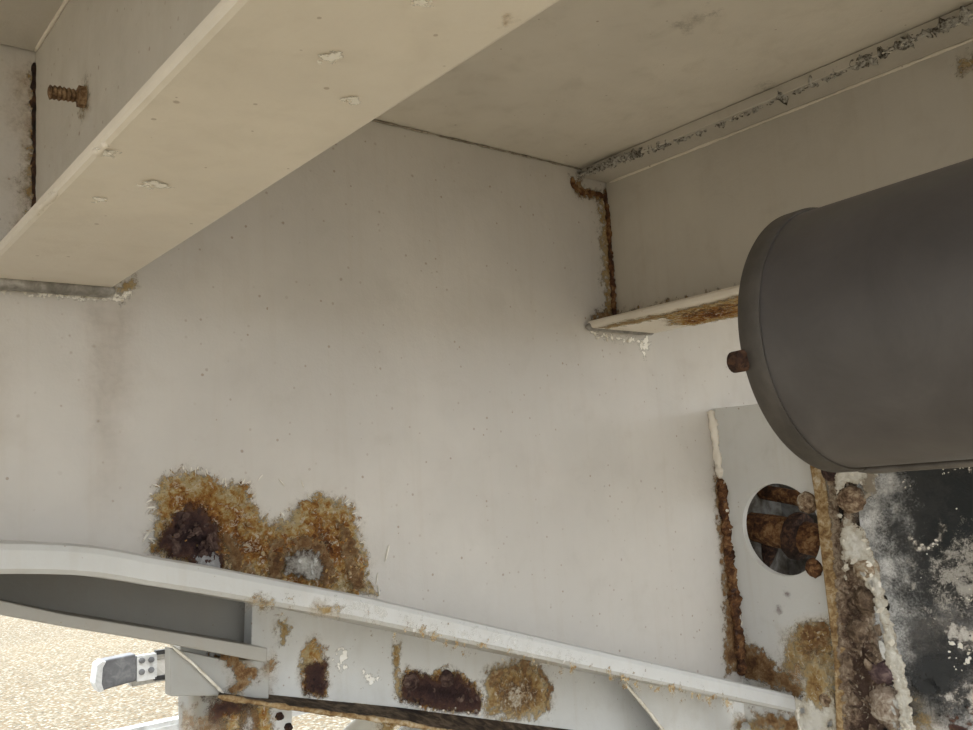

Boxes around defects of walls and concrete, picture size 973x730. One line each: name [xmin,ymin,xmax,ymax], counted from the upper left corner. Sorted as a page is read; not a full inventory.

rust [599,289,738,329]
rust [143,464,380,596]
rust [713,467,900,730]
rust [183,595,293,730]
rust [297,637,329,699]
rust [392,622,577,722]
rust [606,666,798,730]
rust [912,696,933,730]